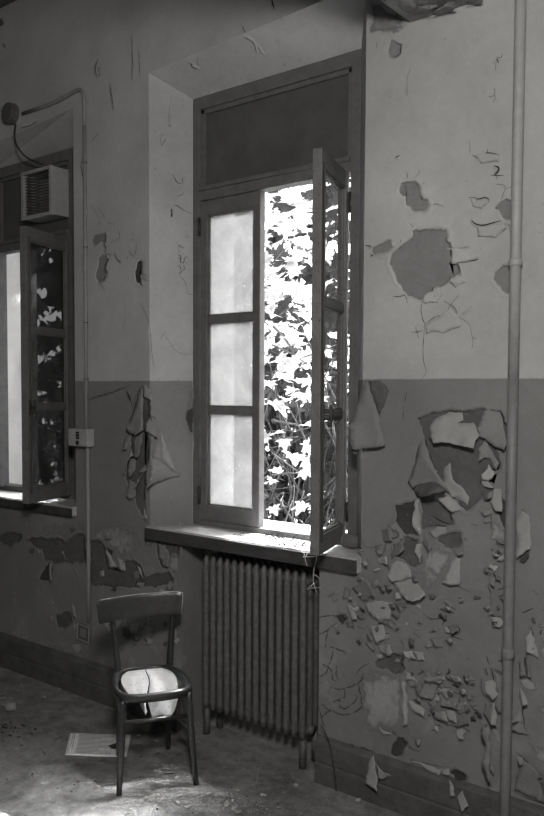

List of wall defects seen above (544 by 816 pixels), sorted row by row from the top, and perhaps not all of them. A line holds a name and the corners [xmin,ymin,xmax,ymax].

peeling [365,175,478,304]
peeling [122,381,181,523]
peeling [349,380,389,455]